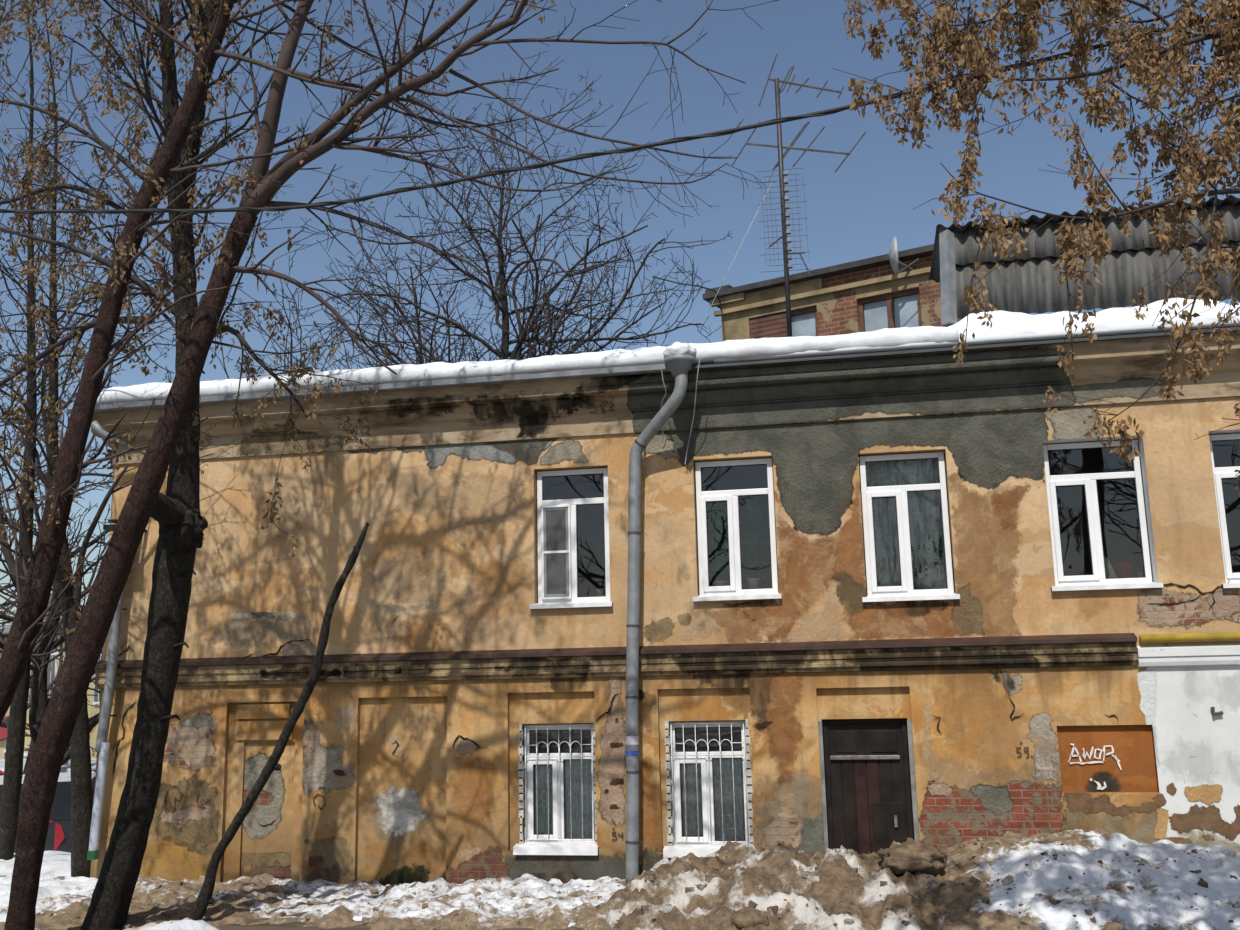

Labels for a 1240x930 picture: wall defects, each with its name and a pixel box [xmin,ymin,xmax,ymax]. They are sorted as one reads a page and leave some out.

water stain [240,424,357,455]
spalling [348,438,589,547]
water stain [388,373,652,438]
spalling [627,346,1167,535]
spalling [1137,587,1240,630]
peeling [140,711,221,880]
spalling [241,751,291,880]
spalling [302,718,356,796]
spalling [303,837,394,884]
peeling [367,787,428,839]
spalling [596,677,626,827]
spalling [918,712,1240,850]